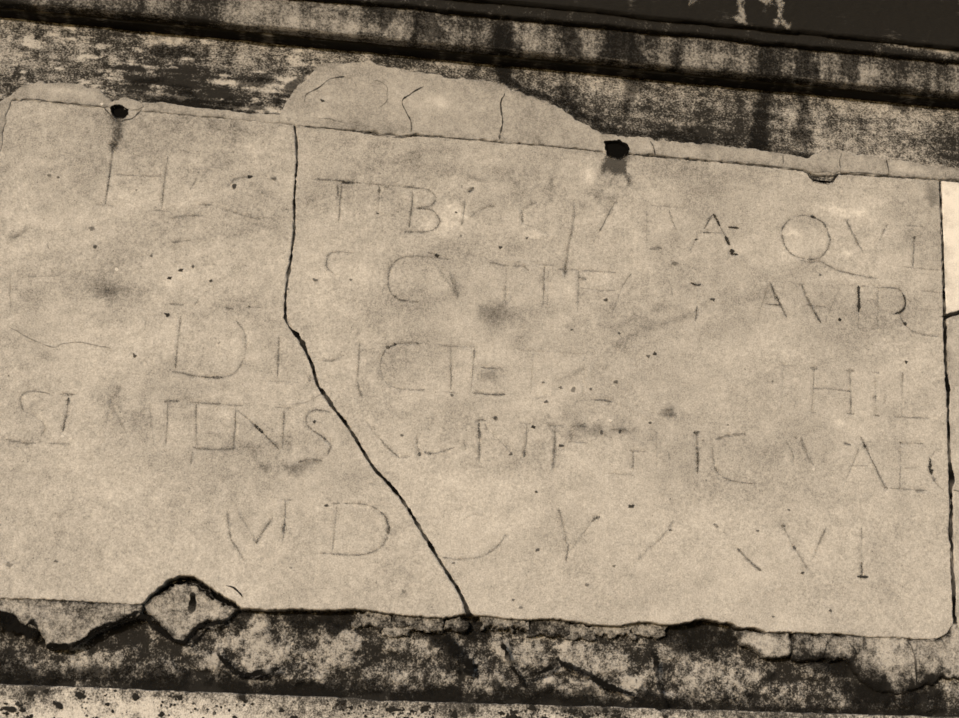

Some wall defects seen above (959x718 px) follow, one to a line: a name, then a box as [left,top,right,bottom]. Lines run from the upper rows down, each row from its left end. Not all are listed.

leakage [365,5,444,48]
leakage [485,24,519,85]
leakage [560,26,583,100]
leakage [747,46,783,150]
leakage [793,49,819,145]
leakage [837,53,860,82]
leakage [601,155,631,182]
crack [283,87,472,617]
spalling [143,578,240,641]
crack [443,635,475,676]
peeling [351,611,668,641]
peeling [742,690,946,717]